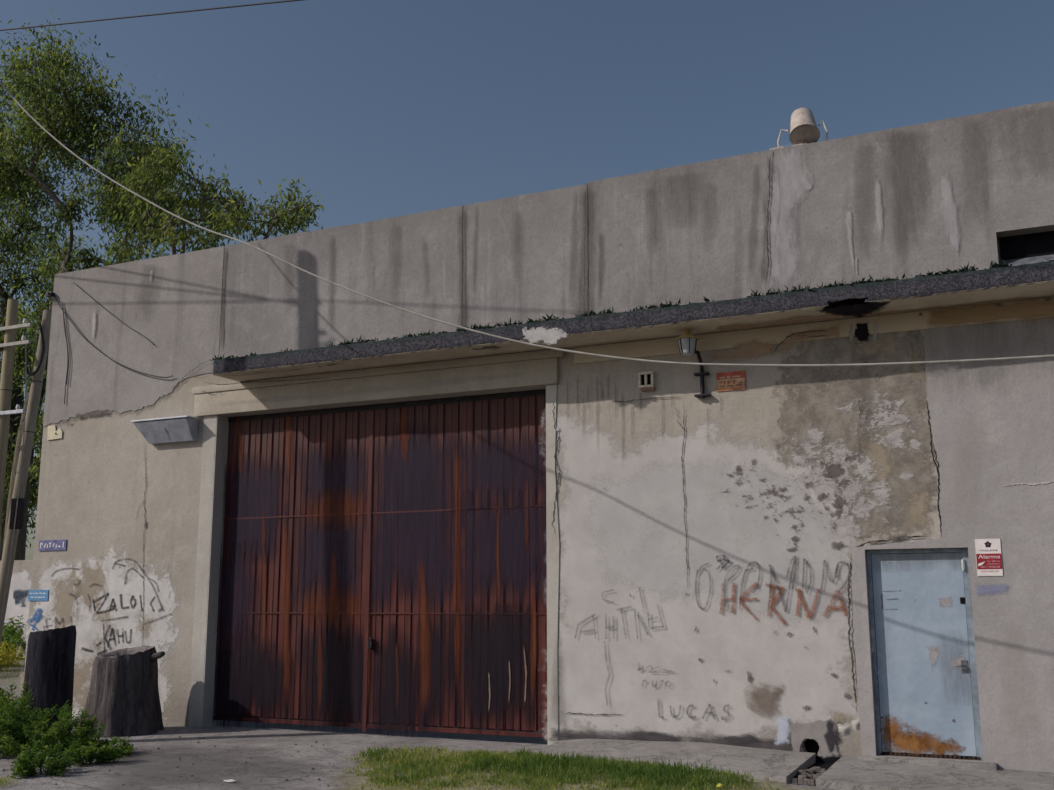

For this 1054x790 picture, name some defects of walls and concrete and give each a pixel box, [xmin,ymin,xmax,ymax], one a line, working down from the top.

leakage [764,149,812,290]
leakage [875,181,883,234]
leakage [941,178,959,251]
spalling [832,298,867,306]
leakage [717,297,1054,331]
crack [552,402,561,529]
crack [610,396,688,595]
peeling [457,321,939,742]
crack [847,403,942,711]
peeling [4,546,180,720]
rust [881,717,962,758]